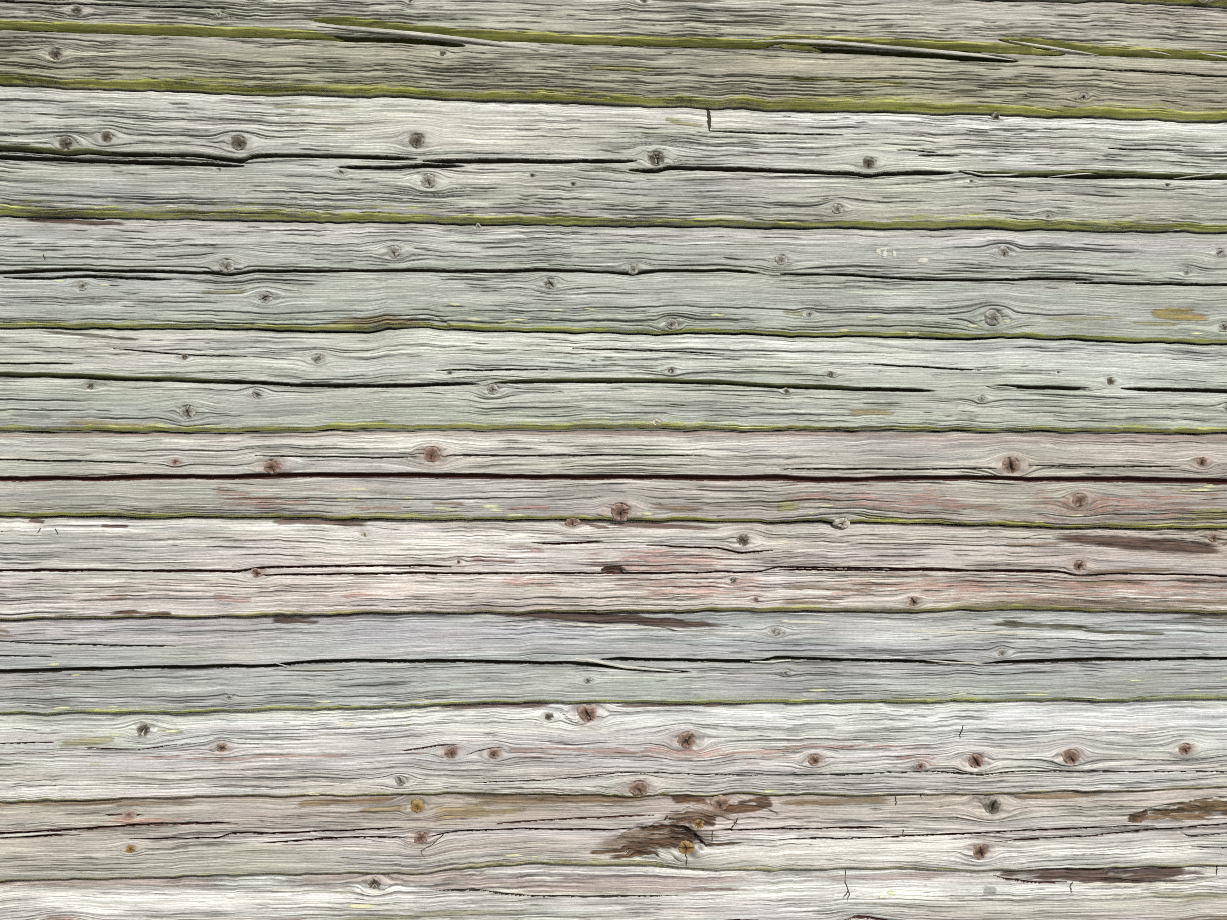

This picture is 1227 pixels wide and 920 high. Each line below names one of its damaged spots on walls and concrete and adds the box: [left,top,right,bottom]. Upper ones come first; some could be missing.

crack [311,20,465,47]
crack [572,42,736,50]
crack [766,39,1227,78]
damp [784,78,907,86]
damp [666,117,703,127]
crack [0,454,1227,485]
crack [0,641,1227,673]
peeling [640,796,773,846]
peeling [1142,809,1227,820]
peeling [590,845,658,859]